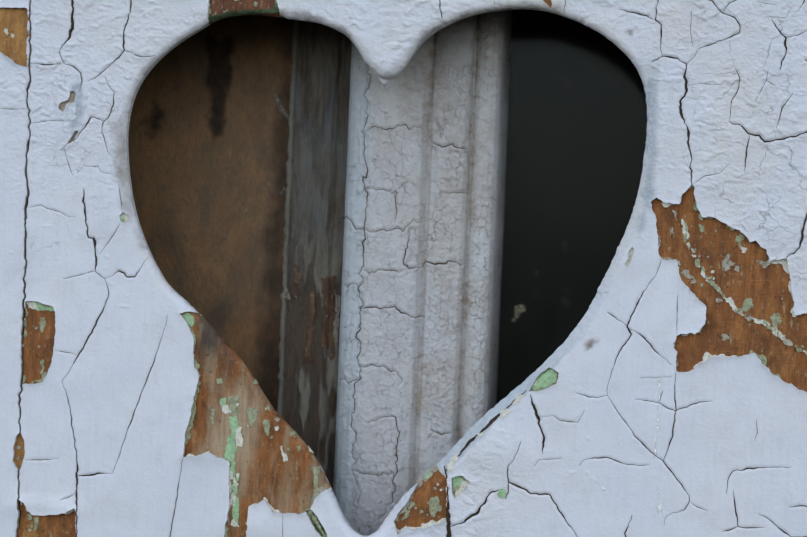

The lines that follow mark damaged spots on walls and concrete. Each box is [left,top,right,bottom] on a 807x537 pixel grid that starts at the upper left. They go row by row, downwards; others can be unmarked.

peeling [0,7,31,68]
crack [619,0,807,185]
peeling [22,301,56,384]
peeling [18,501,76,537]
crack [0,0,167,537]
peeling [181,309,333,537]
crack [339,65,462,519]
peeling [394,453,470,534]
crack [444,262,708,537]
peeling [651,185,807,392]
crack [722,467,807,537]
crack [786,214,807,258]